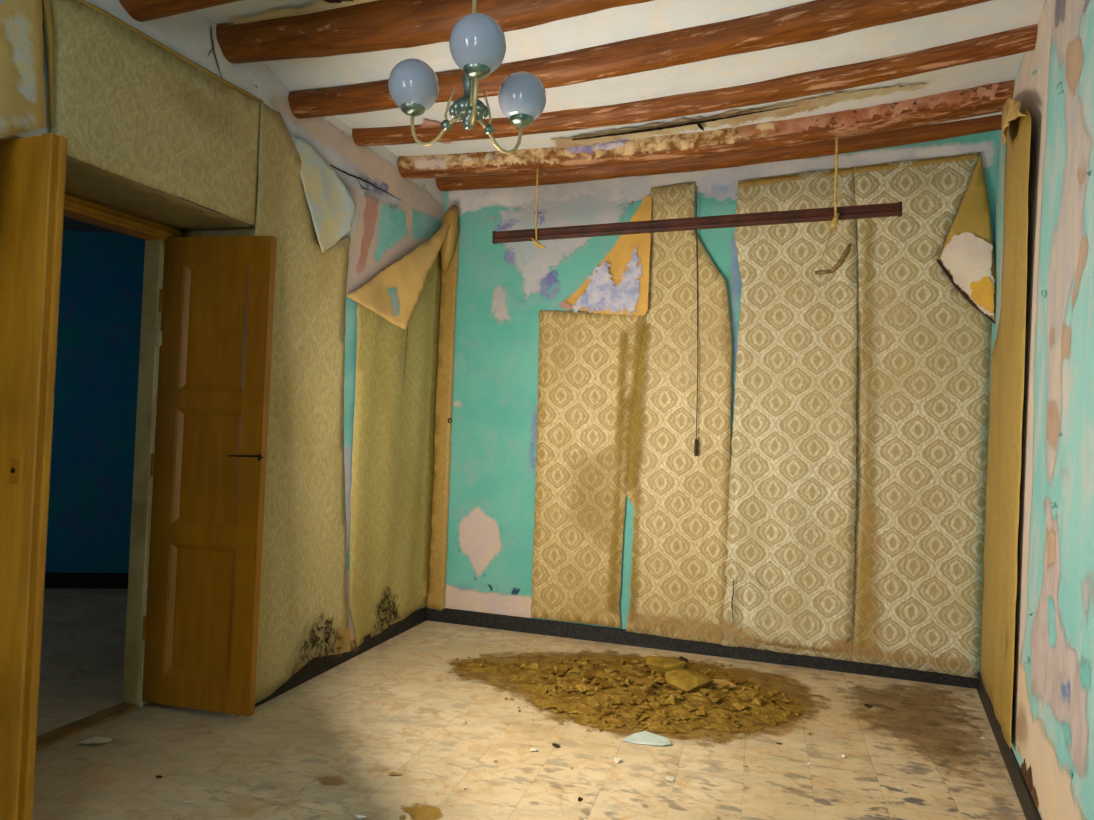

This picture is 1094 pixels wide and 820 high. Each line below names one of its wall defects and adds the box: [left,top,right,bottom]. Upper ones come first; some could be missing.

peeling [227,0,378,25]
peeling [268,94,997,570]
peeling [1013,0,1094,820]
leakage [289,613,361,688]
leakage [372,583,401,636]
flaking render [445,505,532,618]